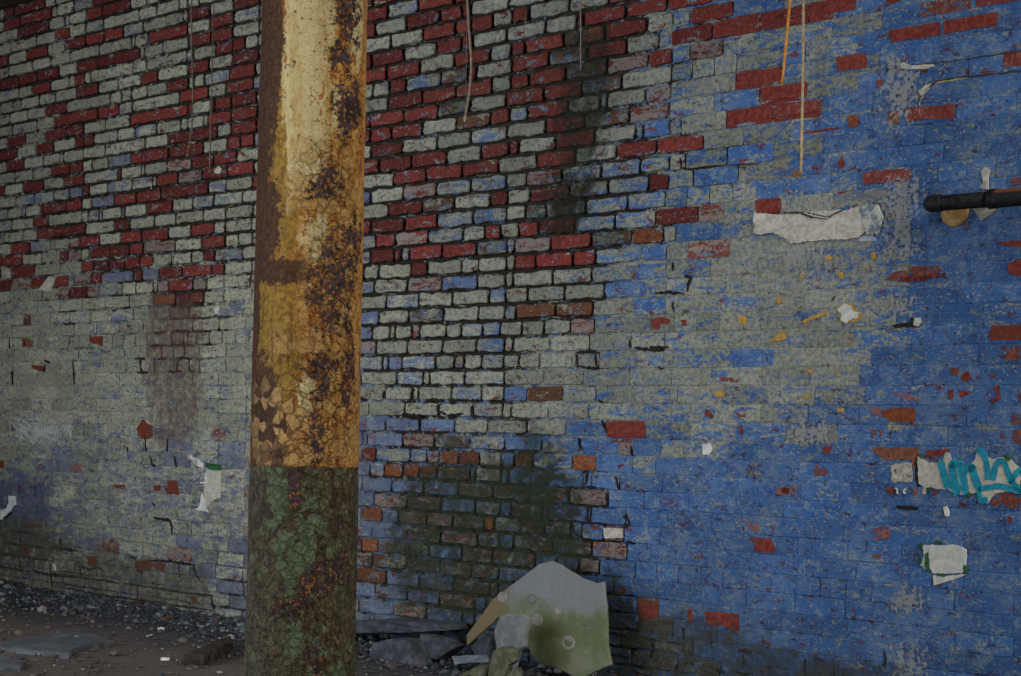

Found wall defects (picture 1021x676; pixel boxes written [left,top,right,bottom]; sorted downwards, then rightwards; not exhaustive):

rust [323,0,366,152]
rust [300,156,348,202]
peeling [755,198,781,213]
rust [287,209,363,515]
rust [271,548,350,623]
damp [385,433,591,633]
peeling [920,545,966,585]